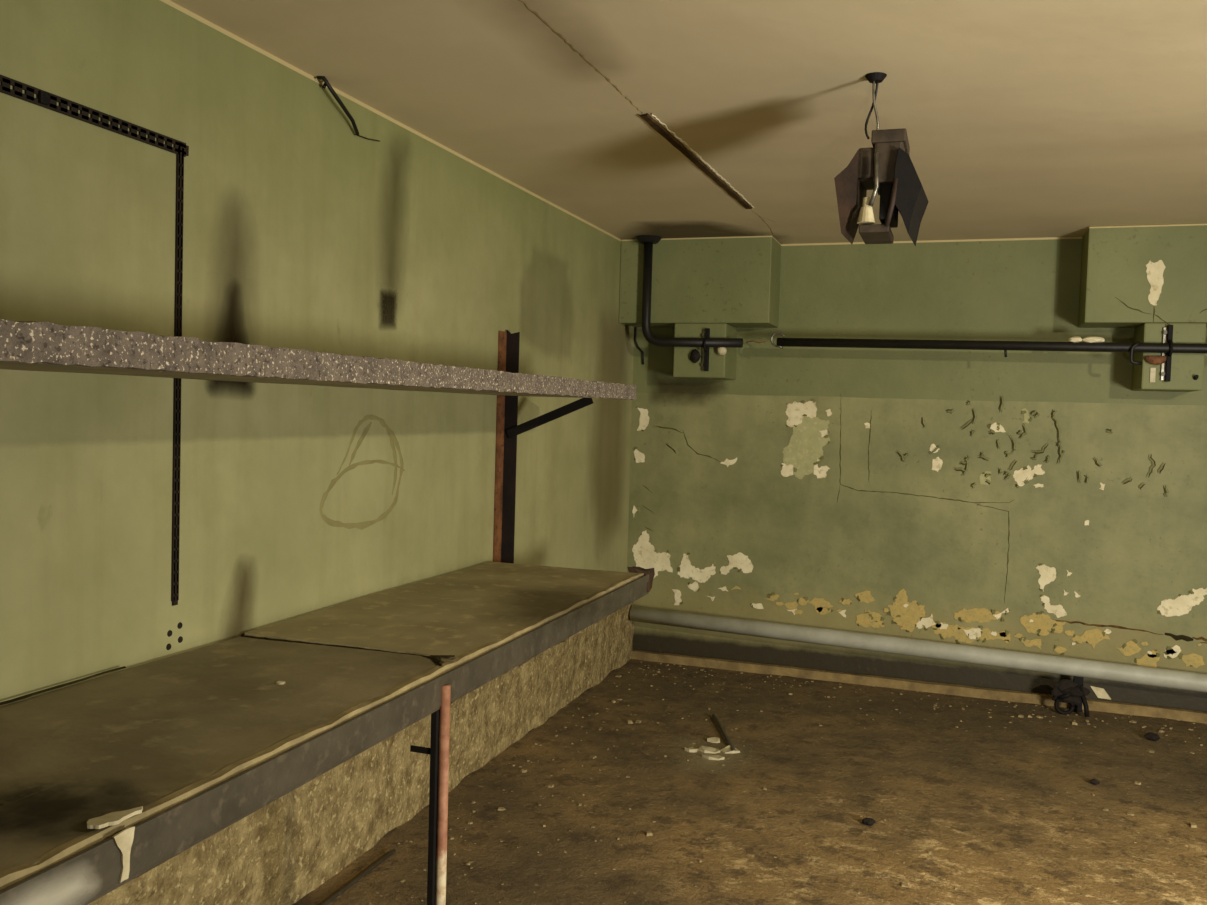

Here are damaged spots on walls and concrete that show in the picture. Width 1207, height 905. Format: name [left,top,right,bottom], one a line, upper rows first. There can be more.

peeling [1146,260,1165,305]
peeling [781,399,832,479]
peeling [930,444,943,472]
peeling [987,422,1006,432]
peeling [1013,464,1045,488]
peeling [632,531,753,605]
peeling [751,563,1207,668]